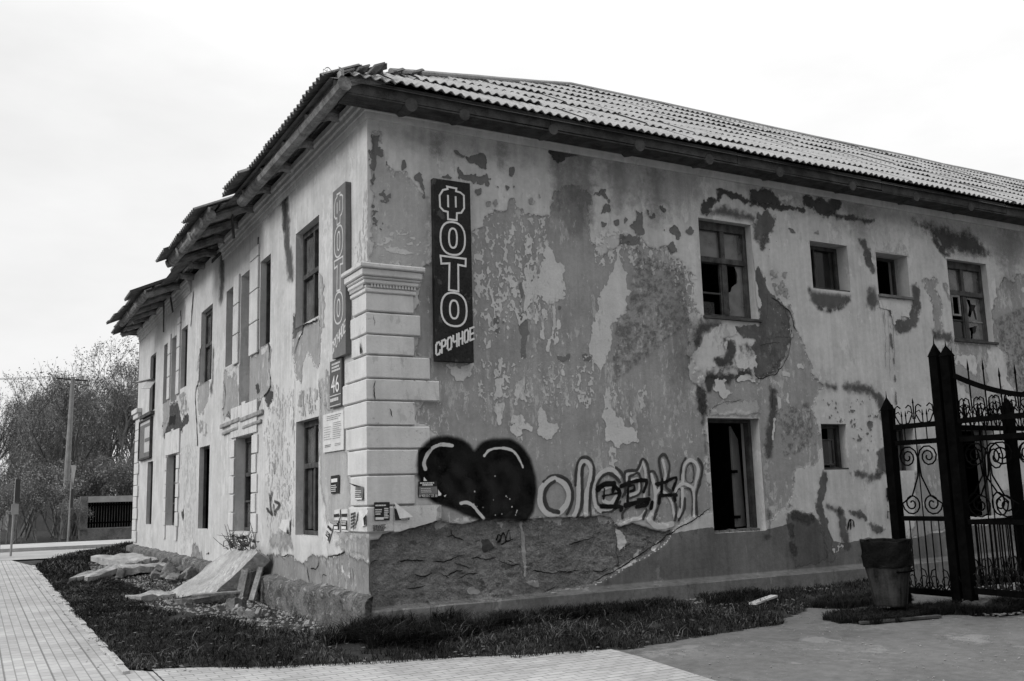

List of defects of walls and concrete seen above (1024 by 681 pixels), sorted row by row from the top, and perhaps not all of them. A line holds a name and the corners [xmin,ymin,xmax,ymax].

damp [280,197,293,282]
peeling [162,130,886,610]
peeling [922,273,1024,426]
crack [371,508,710,592]